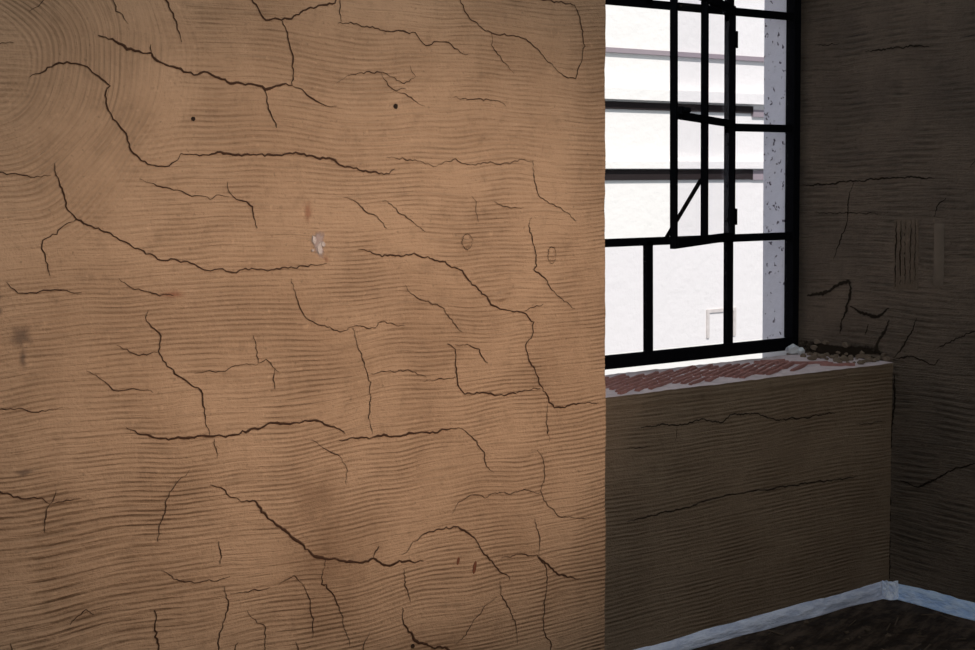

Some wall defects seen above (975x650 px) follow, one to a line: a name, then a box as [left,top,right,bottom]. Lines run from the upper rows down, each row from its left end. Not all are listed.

crack [98,0,468,128]
crack [460,0,585,79]
crack [30,61,575,227]
crack [806,176,932,257]
crack [0,163,597,650]
crack [628,412,836,449]
crack [807,280,975,448]
crack [627,476,858,522]
crack [889,463,975,579]